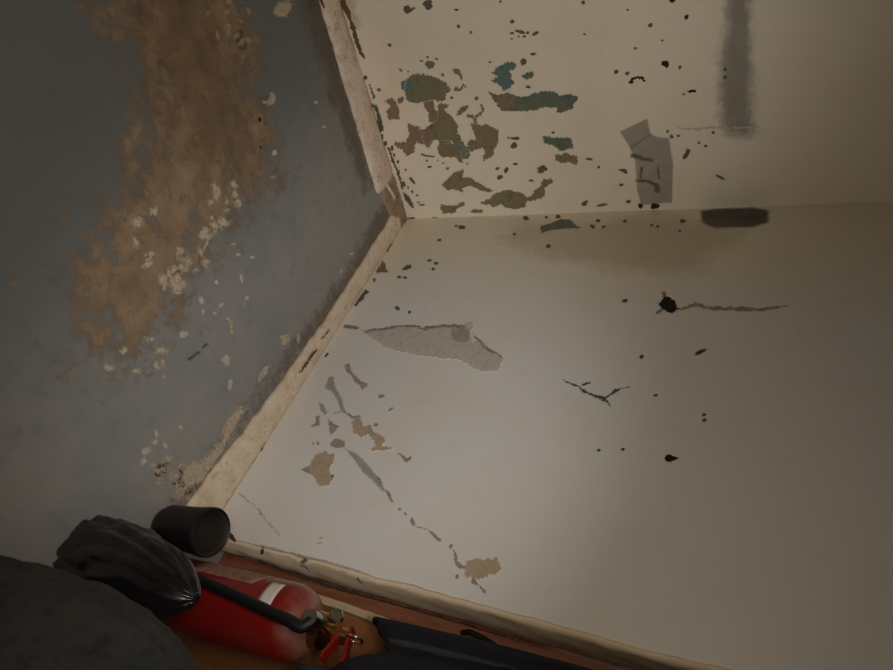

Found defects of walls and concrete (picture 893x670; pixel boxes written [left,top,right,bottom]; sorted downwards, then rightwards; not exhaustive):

peeling [372,53,600,229]
damp [62,0,289,359]
peeling [129,206,158,269]
peeling [159,180,243,294]
flaking render [345,363,368,389]
flaking render [343,306,504,373]
crack [563,379,630,406]
crack [677,302,788,312]
flaking render [301,411,411,487]
crack [376,476,457,560]
crack [238,492,535,647]